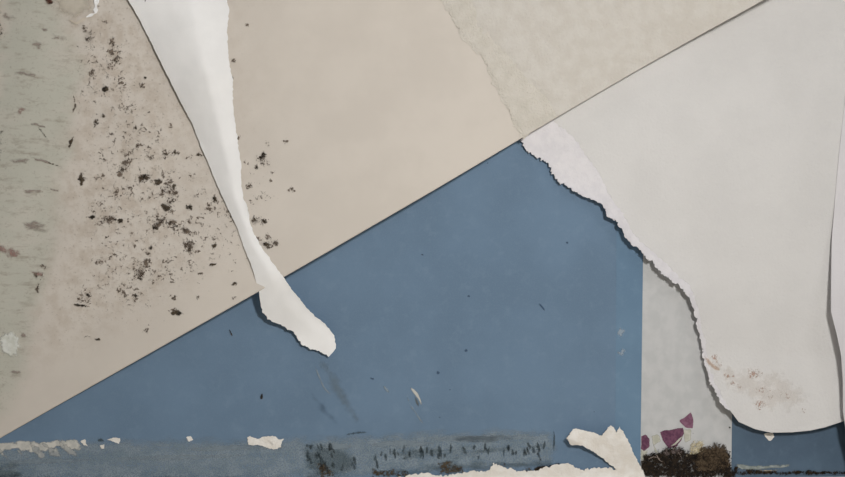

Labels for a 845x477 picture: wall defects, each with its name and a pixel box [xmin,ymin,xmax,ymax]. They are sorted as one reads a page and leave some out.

leakage [77,25,126,96]
peeling [0,0,265,438]
leakage [78,99,234,302]
peeling [227,0,763,277]
leakage [0,432,559,477]
leakage [640,441,845,477]